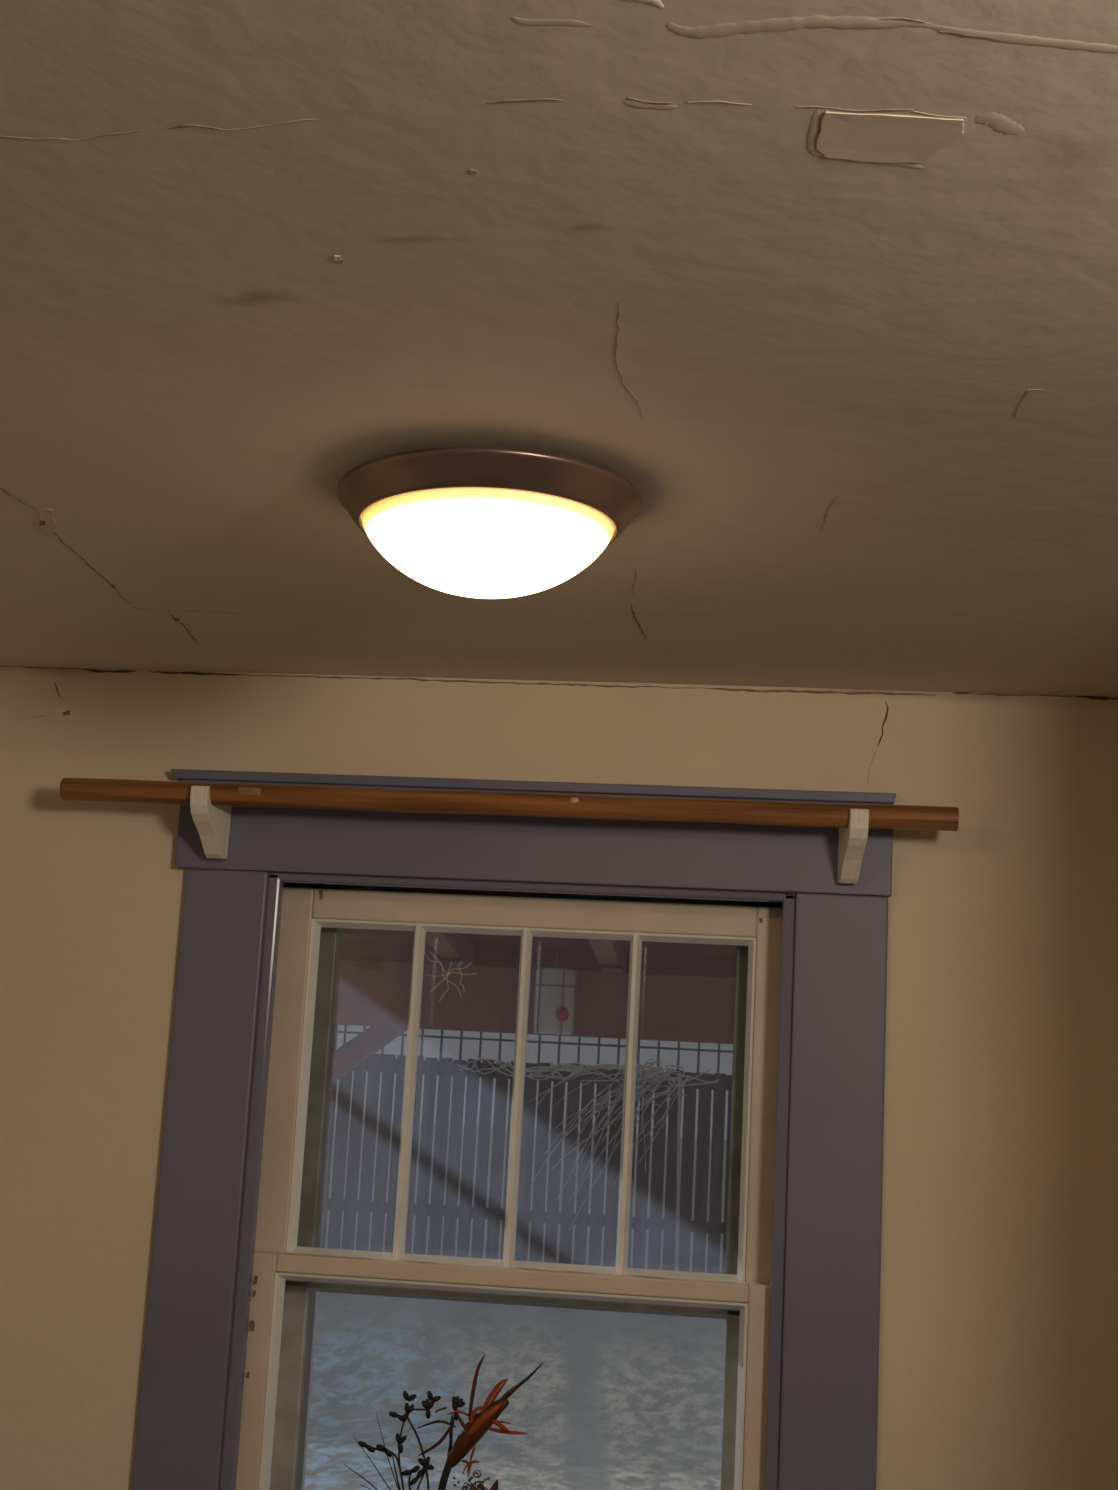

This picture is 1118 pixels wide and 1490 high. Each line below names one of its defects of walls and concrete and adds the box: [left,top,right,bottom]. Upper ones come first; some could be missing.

crack [880,18,1000,41]
crack [488,96,562,104]
crack [623,97,752,110]
crack [797,106,966,118]
crack [0,119,318,141]
crack [0,487,1118,786]